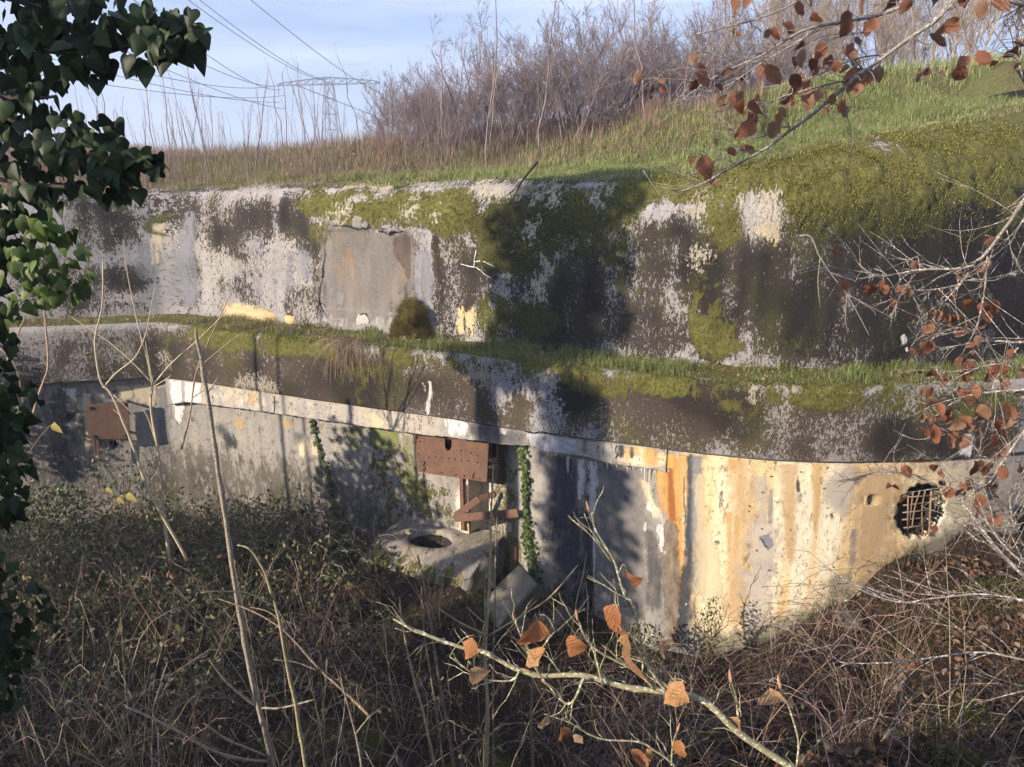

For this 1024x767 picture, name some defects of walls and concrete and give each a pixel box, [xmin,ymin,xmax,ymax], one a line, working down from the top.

peeling [586,180,615,214]
damp [137,213,173,278]
damp [173,211,196,306]
spalling [316,178,565,327]
corrosion [634,447,687,610]
spalling [905,533,931,544]